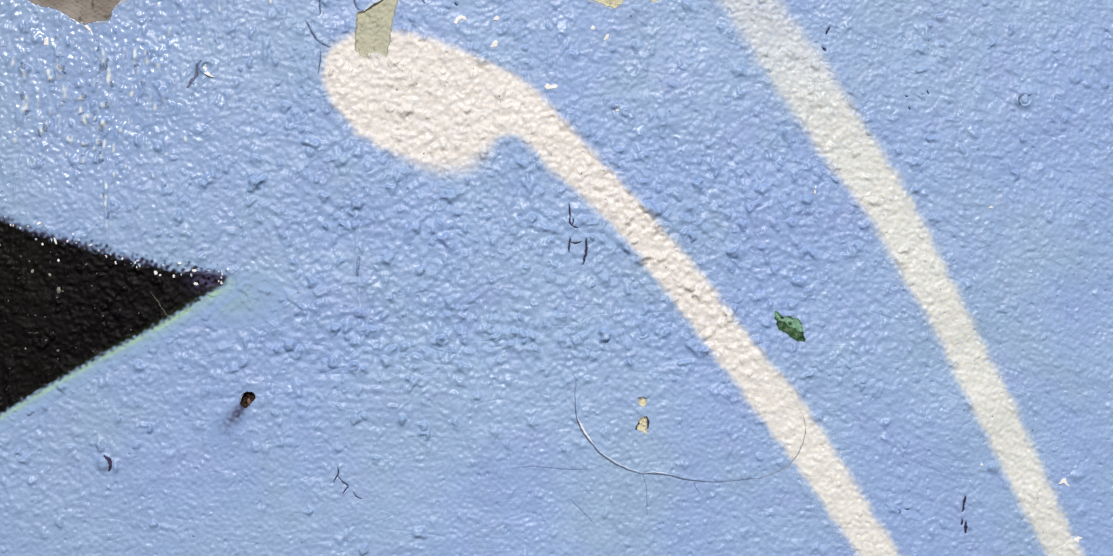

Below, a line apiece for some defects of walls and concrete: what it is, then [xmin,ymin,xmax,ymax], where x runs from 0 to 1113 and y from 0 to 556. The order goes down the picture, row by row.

peeling [29,0,128,34]
peeling [587,0,623,10]
peeling [344,0,398,90]